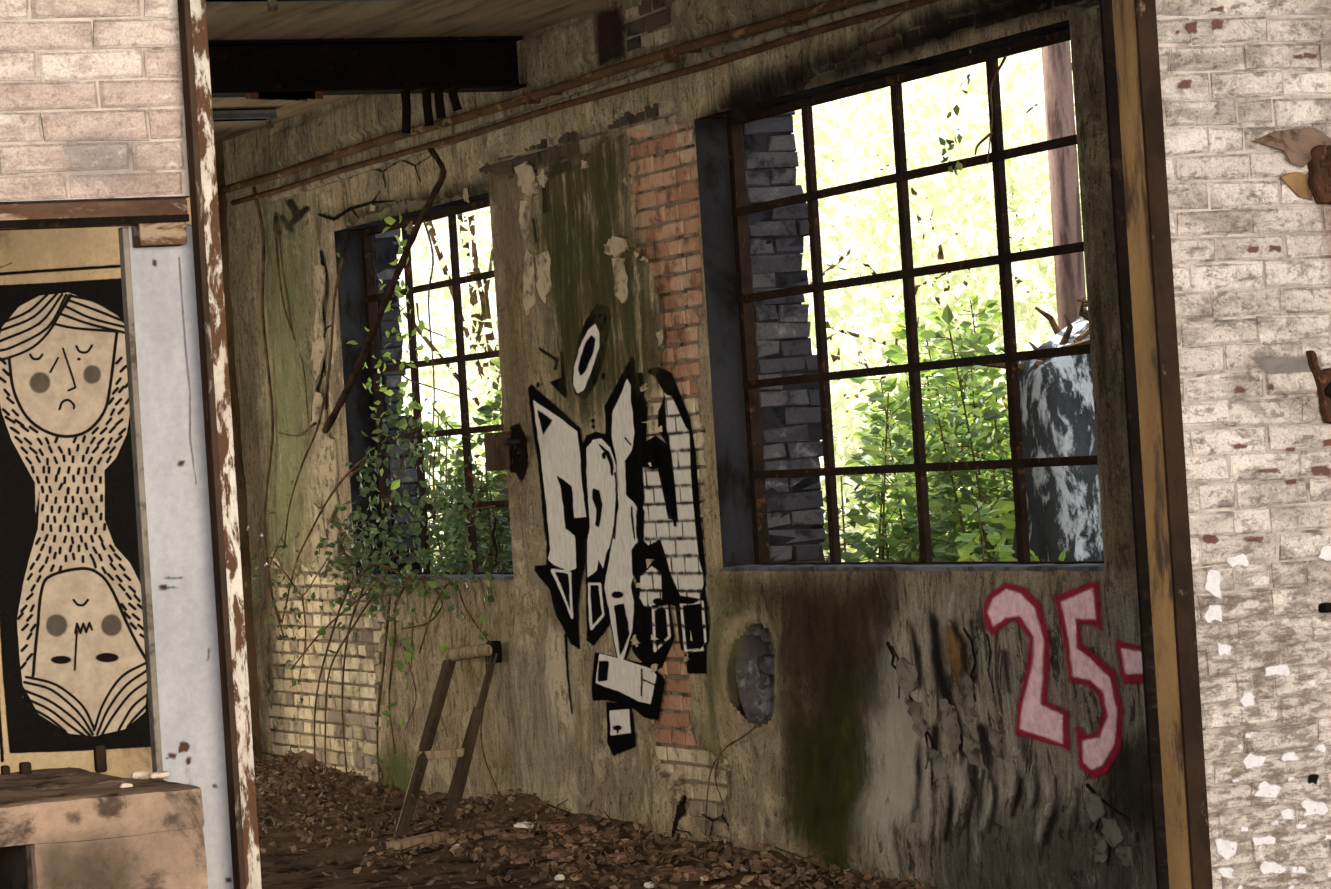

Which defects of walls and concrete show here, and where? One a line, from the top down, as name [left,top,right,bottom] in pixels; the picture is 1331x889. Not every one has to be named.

rust [596,8,624,65]
rust [177,0,246,889]
spalling [262,265,386,783]
spalling [479,98,711,633]
peeling [1312,466,1331,475]
spalling [630,605,731,848]
water stain [735,574,1058,872]
crack [886,641,914,701]
crack [925,730,937,787]
crack [963,627,994,702]
crack [1086,783,1131,865]
peeling [1204,537,1331,889]